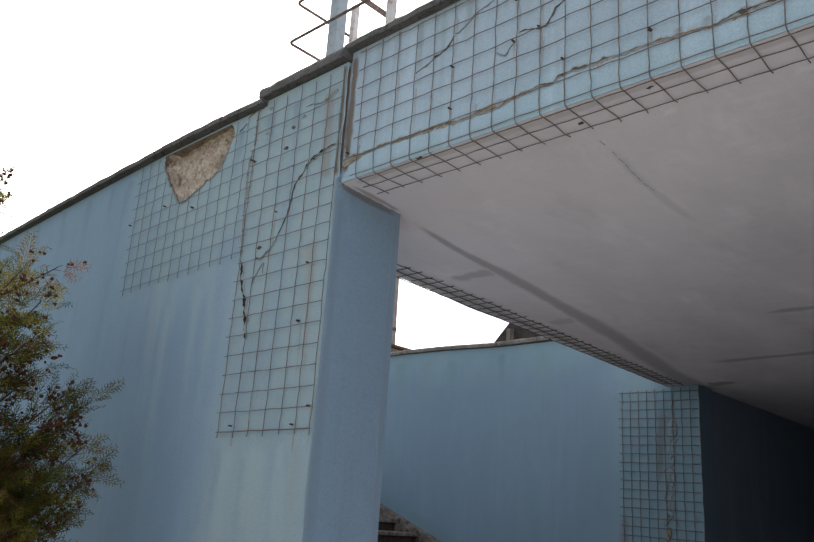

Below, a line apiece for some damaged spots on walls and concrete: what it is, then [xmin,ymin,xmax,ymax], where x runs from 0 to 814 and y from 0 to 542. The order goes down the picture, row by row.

spalling [120,0,814,438]
crack [239,0,781,339]
crack [664,392,679,542]